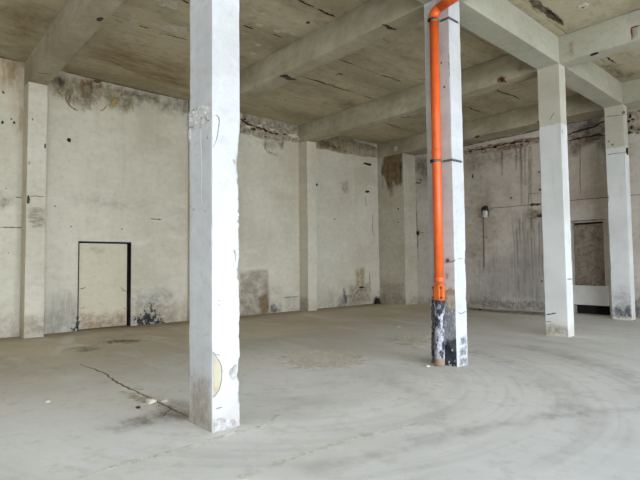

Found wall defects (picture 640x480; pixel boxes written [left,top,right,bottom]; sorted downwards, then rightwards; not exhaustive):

crack [298,0,335,17]
spalling [529,0,564,25]
crack [303,60,372,99]
spalling [188,102,211,130]
spalling [240,118,300,143]
peeling [316,136,377,166]
crack [463,113,627,196]
damp [134,303,164,325]
crack [80,364,188,417]